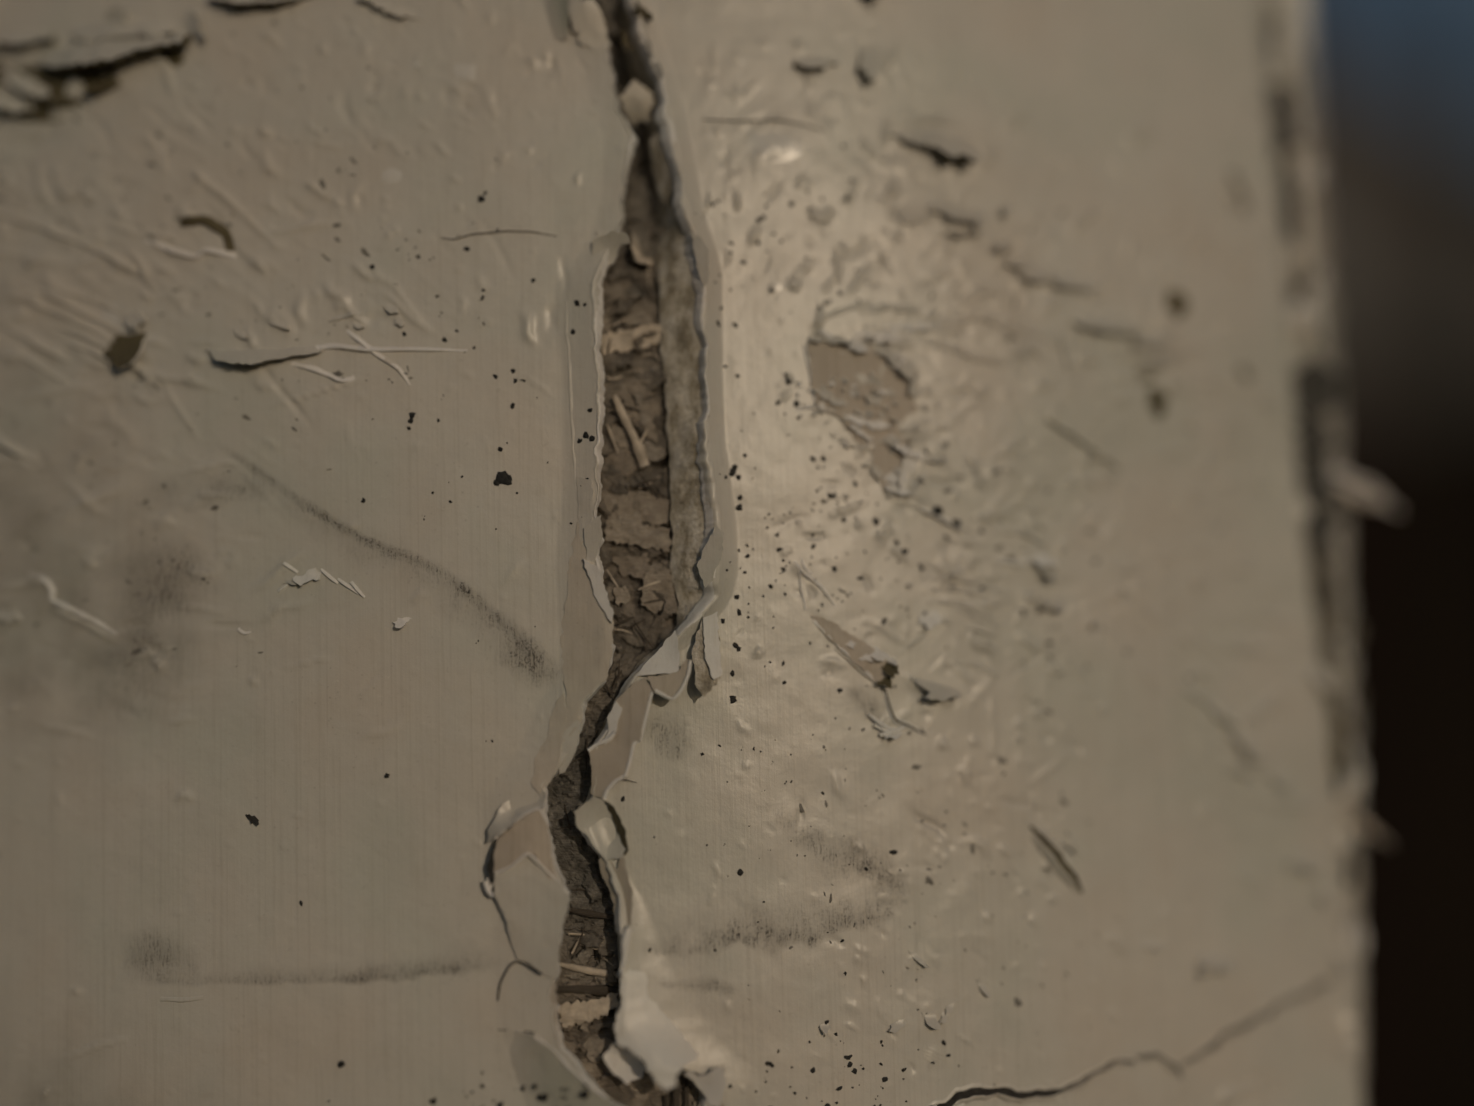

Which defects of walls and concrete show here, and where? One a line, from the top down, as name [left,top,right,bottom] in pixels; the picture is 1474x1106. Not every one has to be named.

peeling [0,5,207,123]
peeling [212,0,302,14]
peeling [888,116,980,165]
crack [441,230,557,241]
peeling [786,322,962,530]
crack [1267,0,1365,806]
crack [483,0,824,1106]
spalling [810,615,962,740]
crack [927,847,1367,1106]